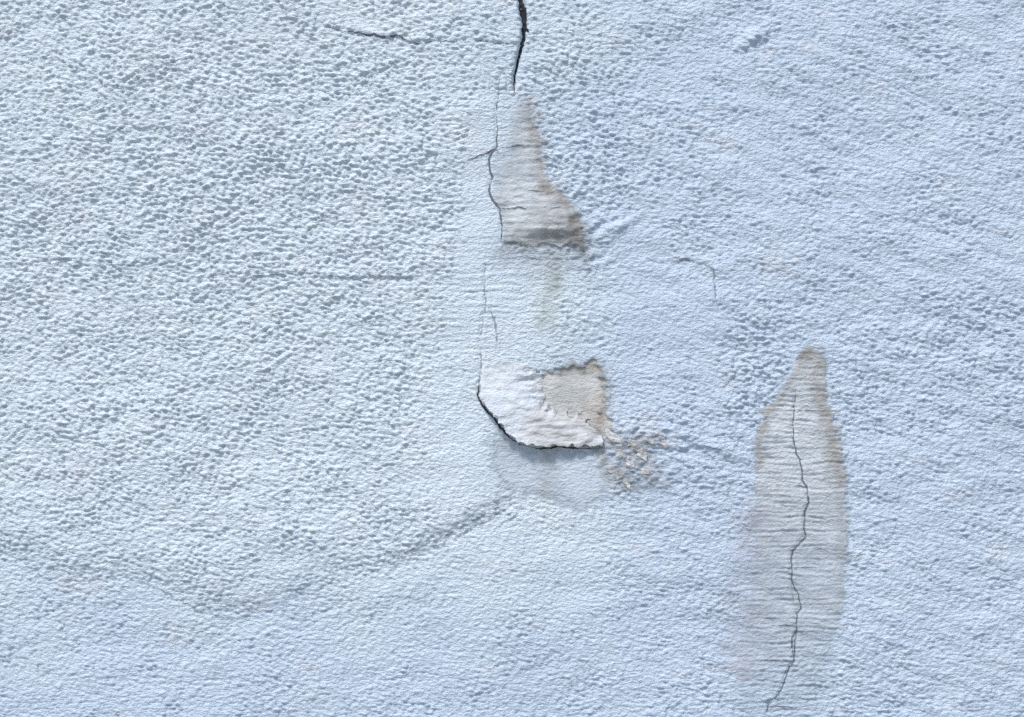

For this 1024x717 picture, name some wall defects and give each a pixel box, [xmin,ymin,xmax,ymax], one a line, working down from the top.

crack [326,0,529,240]
crack [476,267,497,394]
peeling [477,359,613,512]
crack [767,389,810,710]